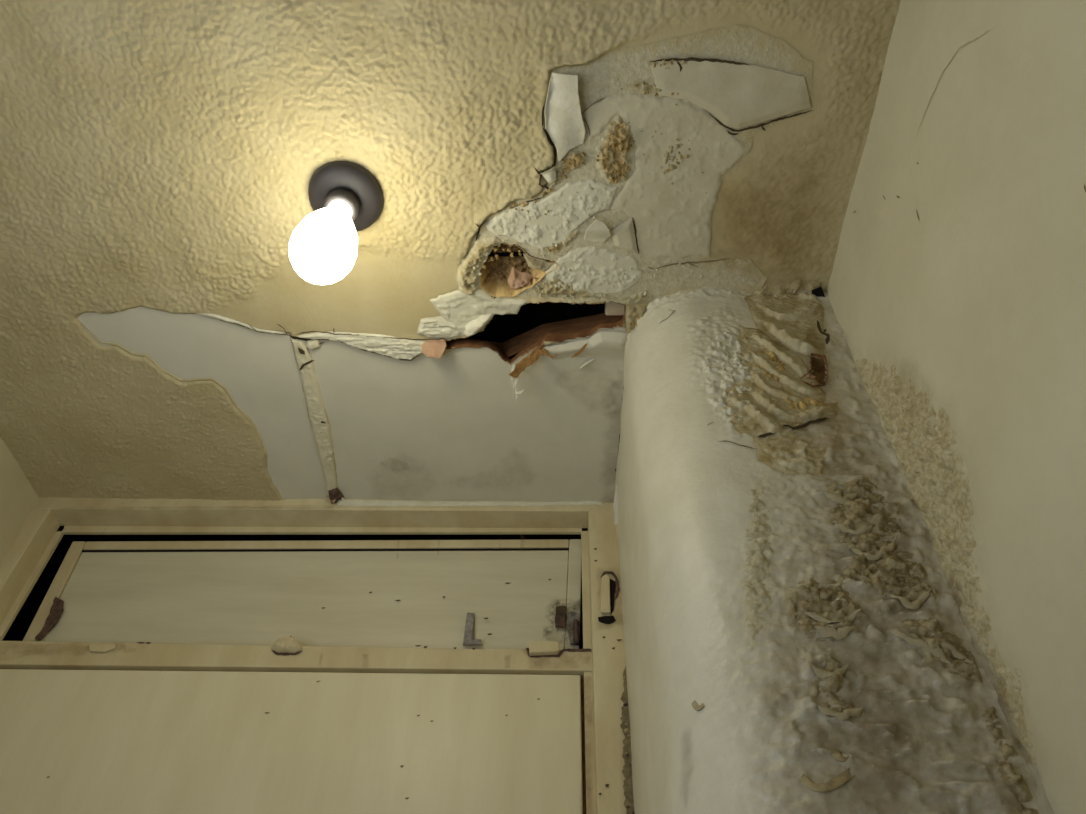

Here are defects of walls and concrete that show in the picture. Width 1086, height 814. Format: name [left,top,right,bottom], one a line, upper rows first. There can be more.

peeling [78,25,839,525]